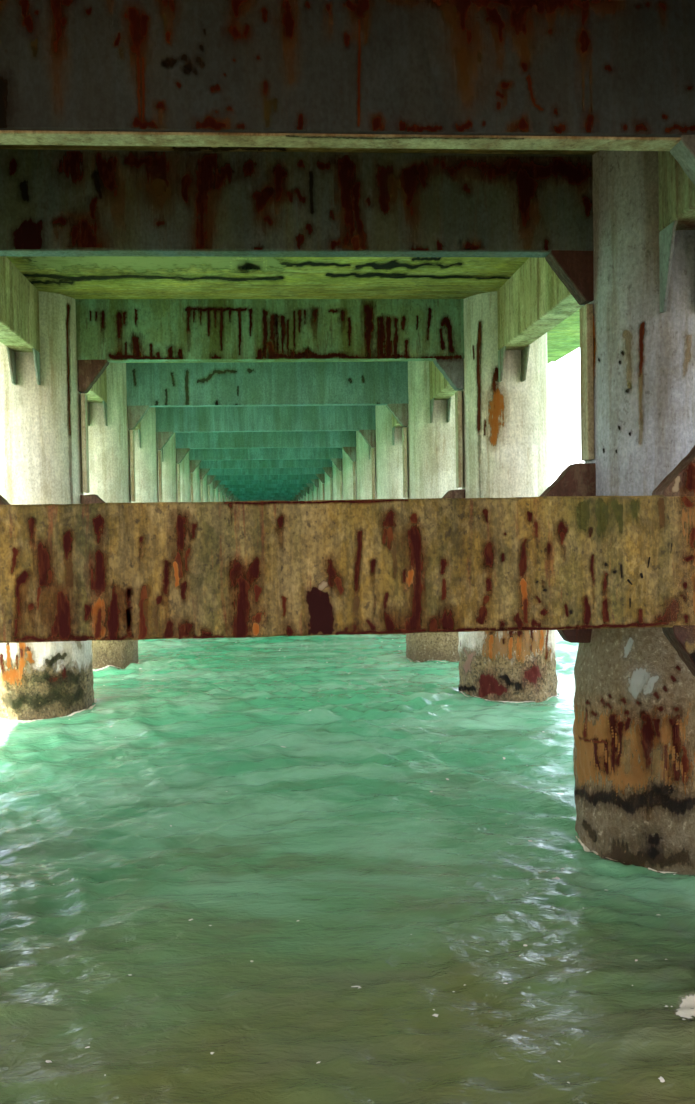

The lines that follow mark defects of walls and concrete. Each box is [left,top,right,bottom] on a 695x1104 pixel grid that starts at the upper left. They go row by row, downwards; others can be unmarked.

corrosion [0,76,8,128]
corrosion [114,6,165,130]
corrosion [196,106,245,131]
corrosion [399,119,486,132]
corrosion [13,151,592,250]
corrosion [89,309,183,360]
corrosion [185,304,505,447]
corrosion [622,322,645,445]
corrosion [683,335,692,377]
corrosion [0,513,265,687]
corrosion [224,462,695,668]
corrosion [573,695,695,802]